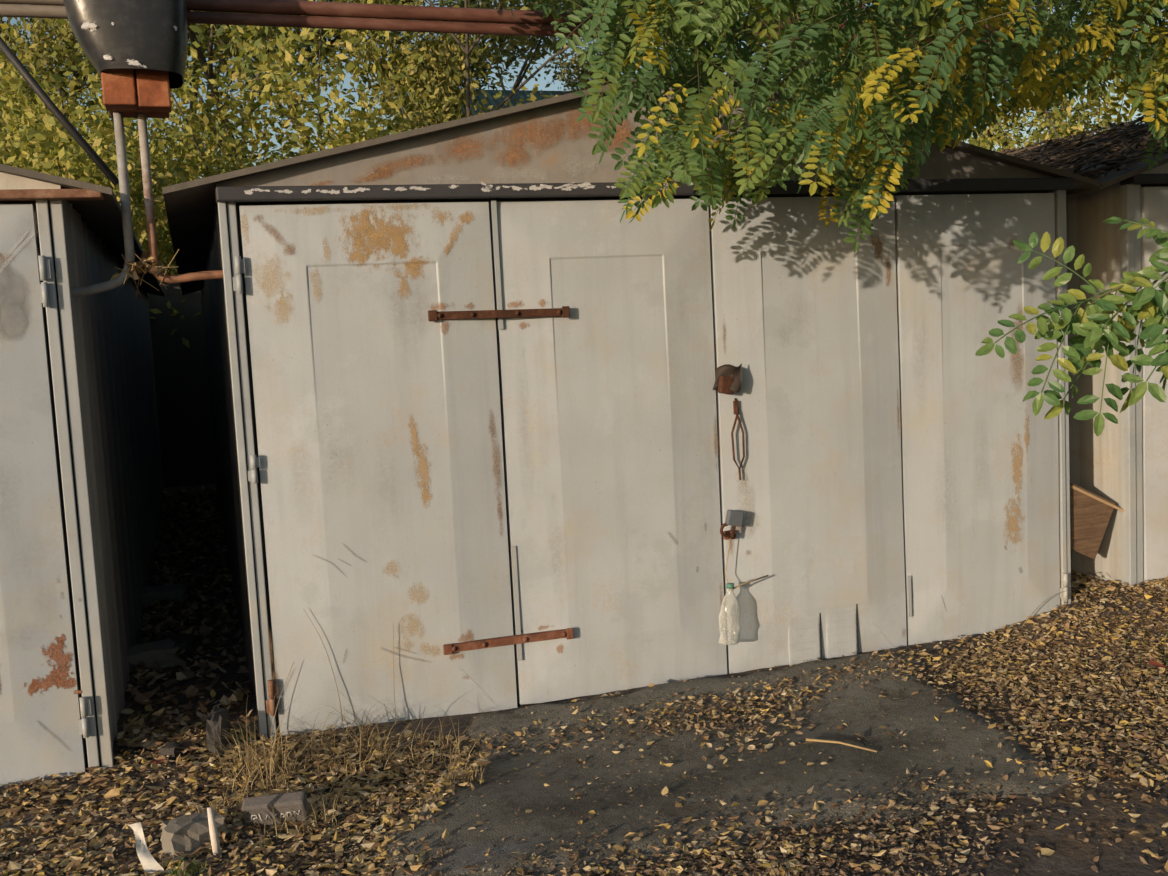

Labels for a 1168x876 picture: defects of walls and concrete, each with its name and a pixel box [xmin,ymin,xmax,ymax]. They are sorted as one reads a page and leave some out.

corrosion [500,111,630,165]
peeling [245,186,431,195]
peeling [481,182,626,192]
corrosion [347,203,427,296]
corrosion [409,419,430,505]
corrosion [1006,417,1029,544]